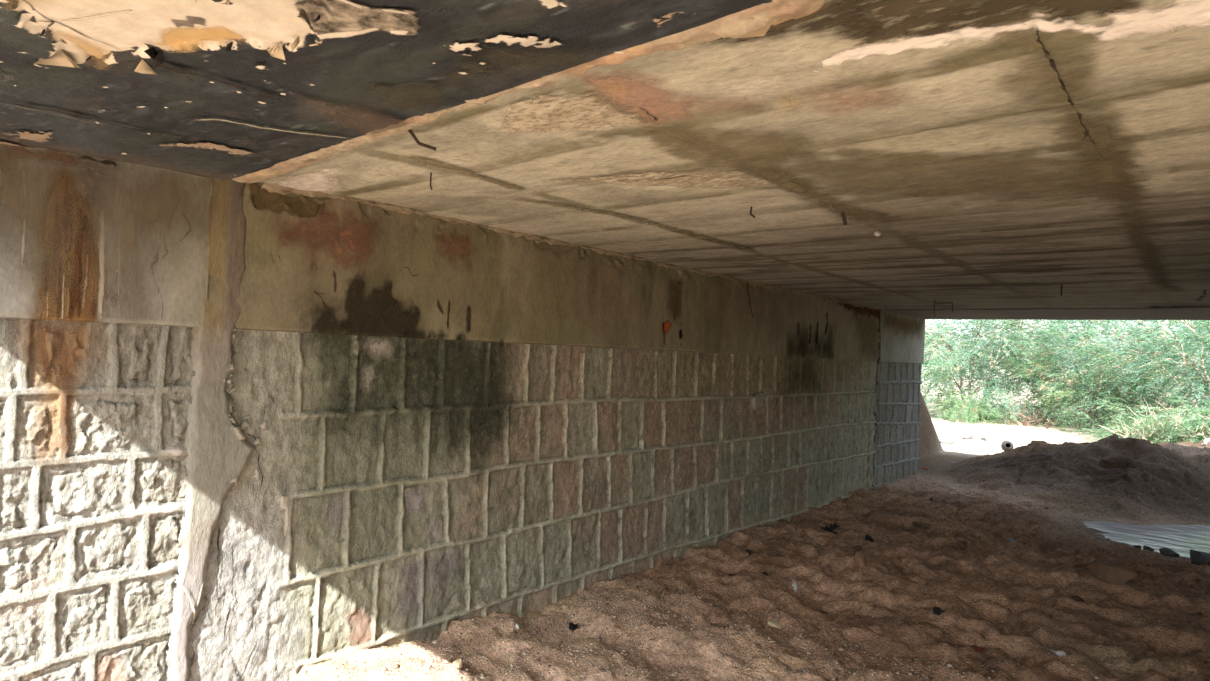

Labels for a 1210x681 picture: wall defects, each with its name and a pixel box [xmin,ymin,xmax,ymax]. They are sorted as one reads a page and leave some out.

spalling [0,0,419,75]
damp [646,61,1176,288]
crack [1036,31,1103,158]
rust [8,147,100,452]
damp [312,276,509,456]
damp [788,313,833,380]